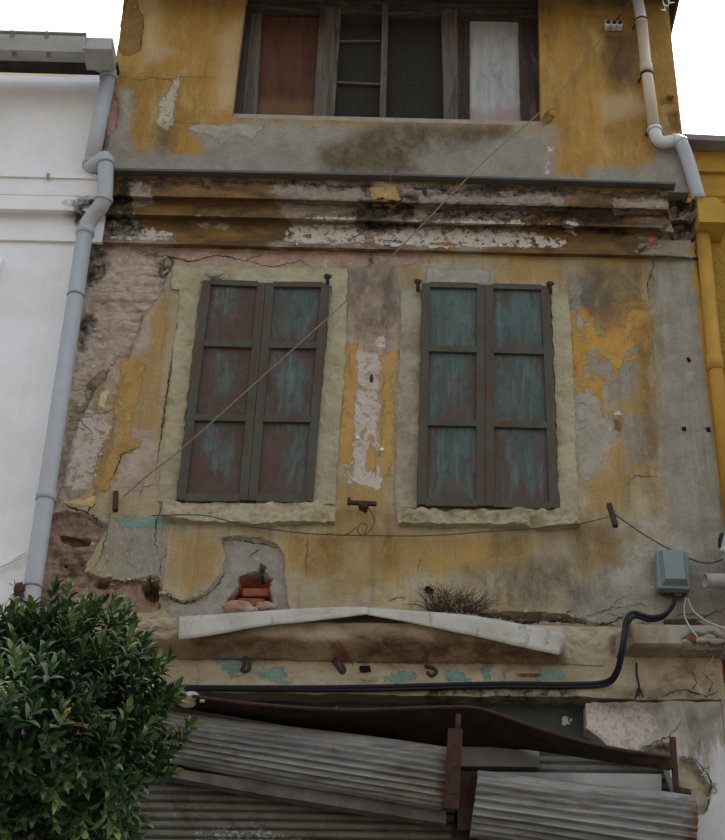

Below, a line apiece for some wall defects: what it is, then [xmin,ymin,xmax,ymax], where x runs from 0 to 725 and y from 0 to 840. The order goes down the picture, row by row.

flaking render [119,0,144,56]
peeling [156,70,182,130]
flaking render [612,196,697,260]
crack [137,248,310,274]
flaking render [39,181,579,618]
peeling [570,300,651,480]
crack [661,672,718,697]
peeling [586,705,718,815]